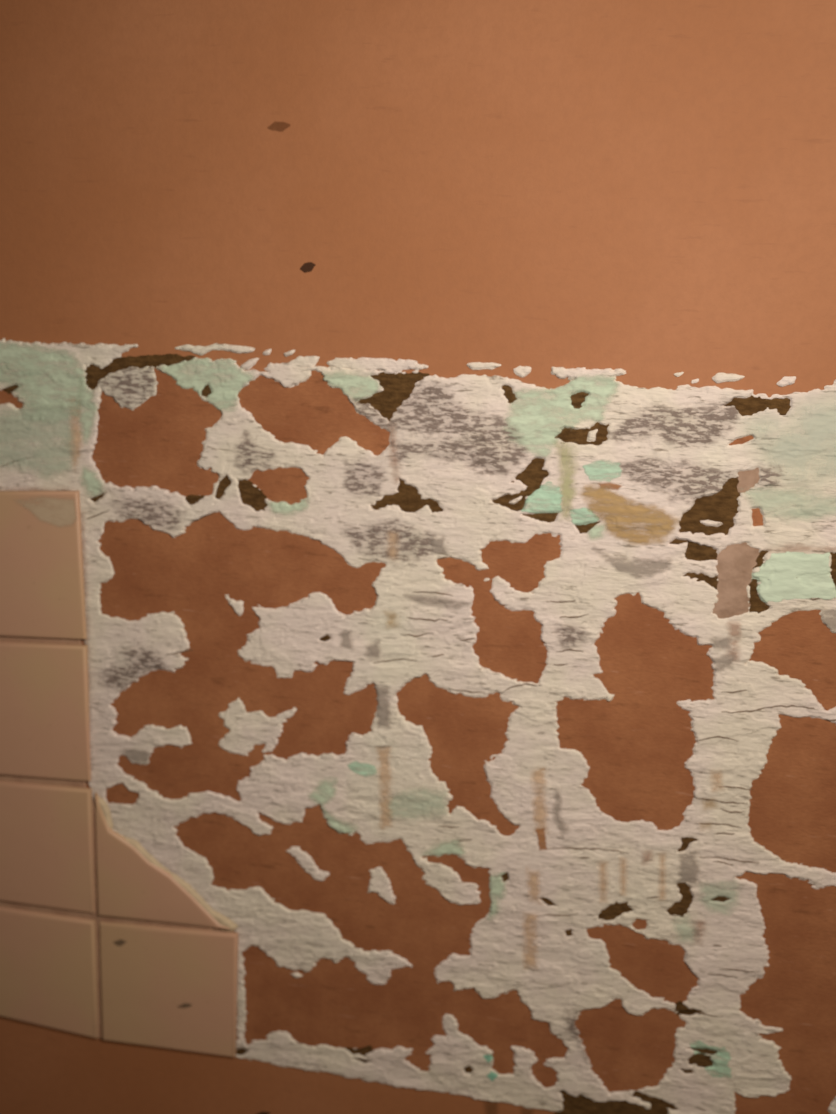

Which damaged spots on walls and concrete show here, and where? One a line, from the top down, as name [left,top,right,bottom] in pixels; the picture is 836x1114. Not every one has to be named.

peeling [85,343,429,932]
spalling [371,479,443,513]
peeling [467,362,531,403]
peeling [437,458,561,683]
spalling [570,392,589,409]
spalling [555,422,609,446]
spalling [669,477,764,589]
spalling [724,376,796,416]
peeling [396,674,520,836]
peeling [556,592,715,852]
peeling [734,551,836,1114]
peeling [174,804,718,1114]